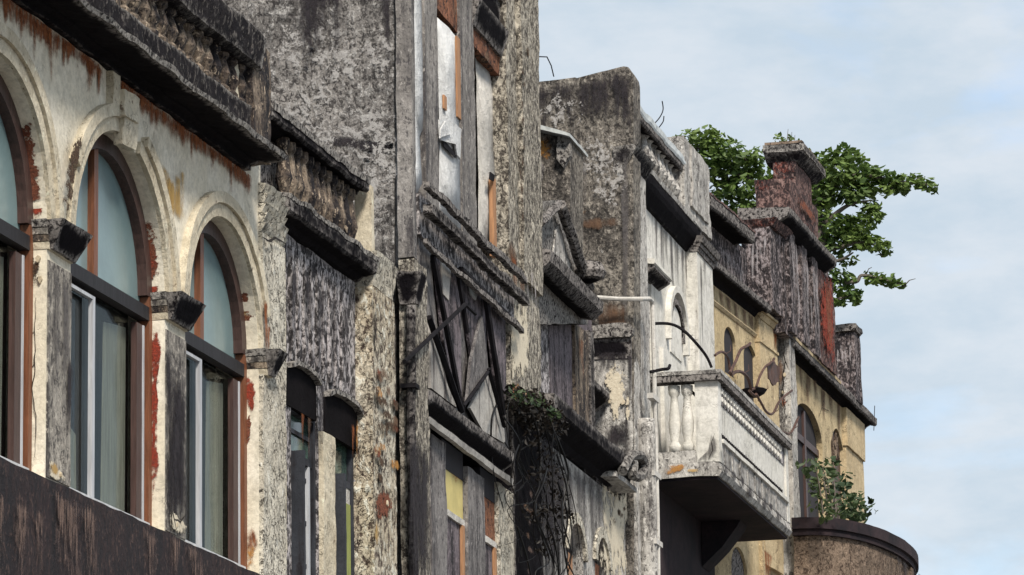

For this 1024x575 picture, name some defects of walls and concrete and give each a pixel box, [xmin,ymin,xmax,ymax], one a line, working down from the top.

corrosion [0,0,101,92]
corrosion [121,80,251,189]
flaking render [820,276,835,364]
peeling [152,332,161,487]
peeling [247,378,256,444]
peeling [605,364,630,422]
water stain [166,352,201,575]
water stain [0,492,97,575]